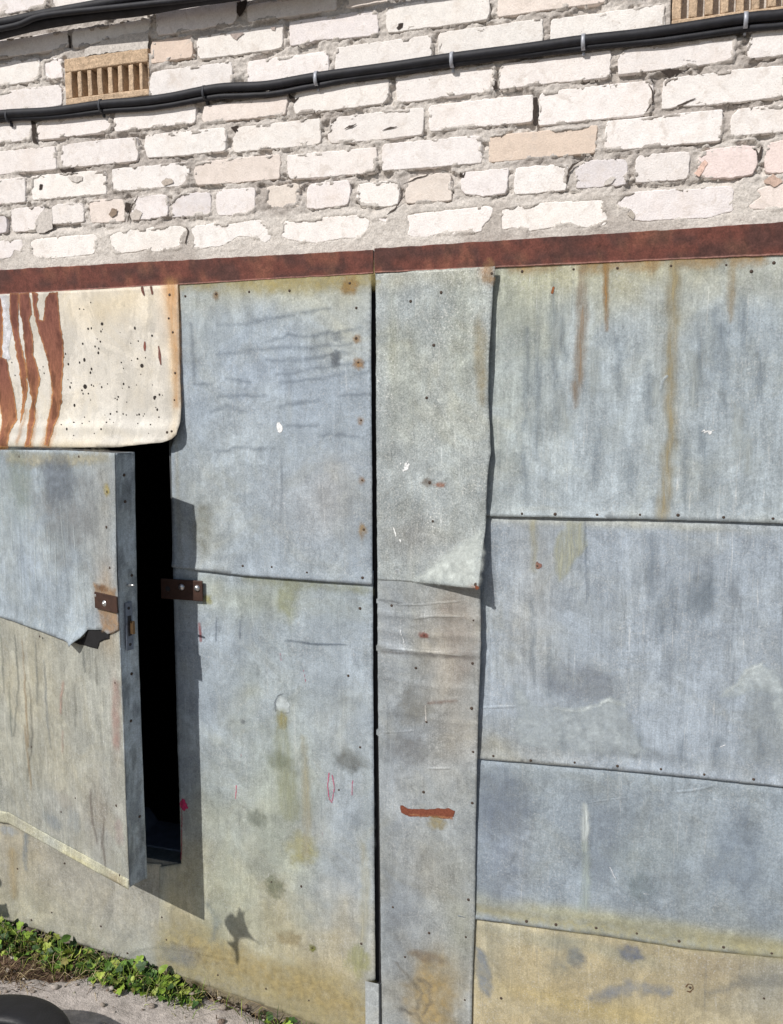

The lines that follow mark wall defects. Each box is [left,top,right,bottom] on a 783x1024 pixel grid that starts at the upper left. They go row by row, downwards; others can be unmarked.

corrosion [236,269,374,293]
corrosion [580,263,607,309]
corrosion [0,292,64,448]
corrosion [574,307,584,396]
corrosion [400,805,455,828]